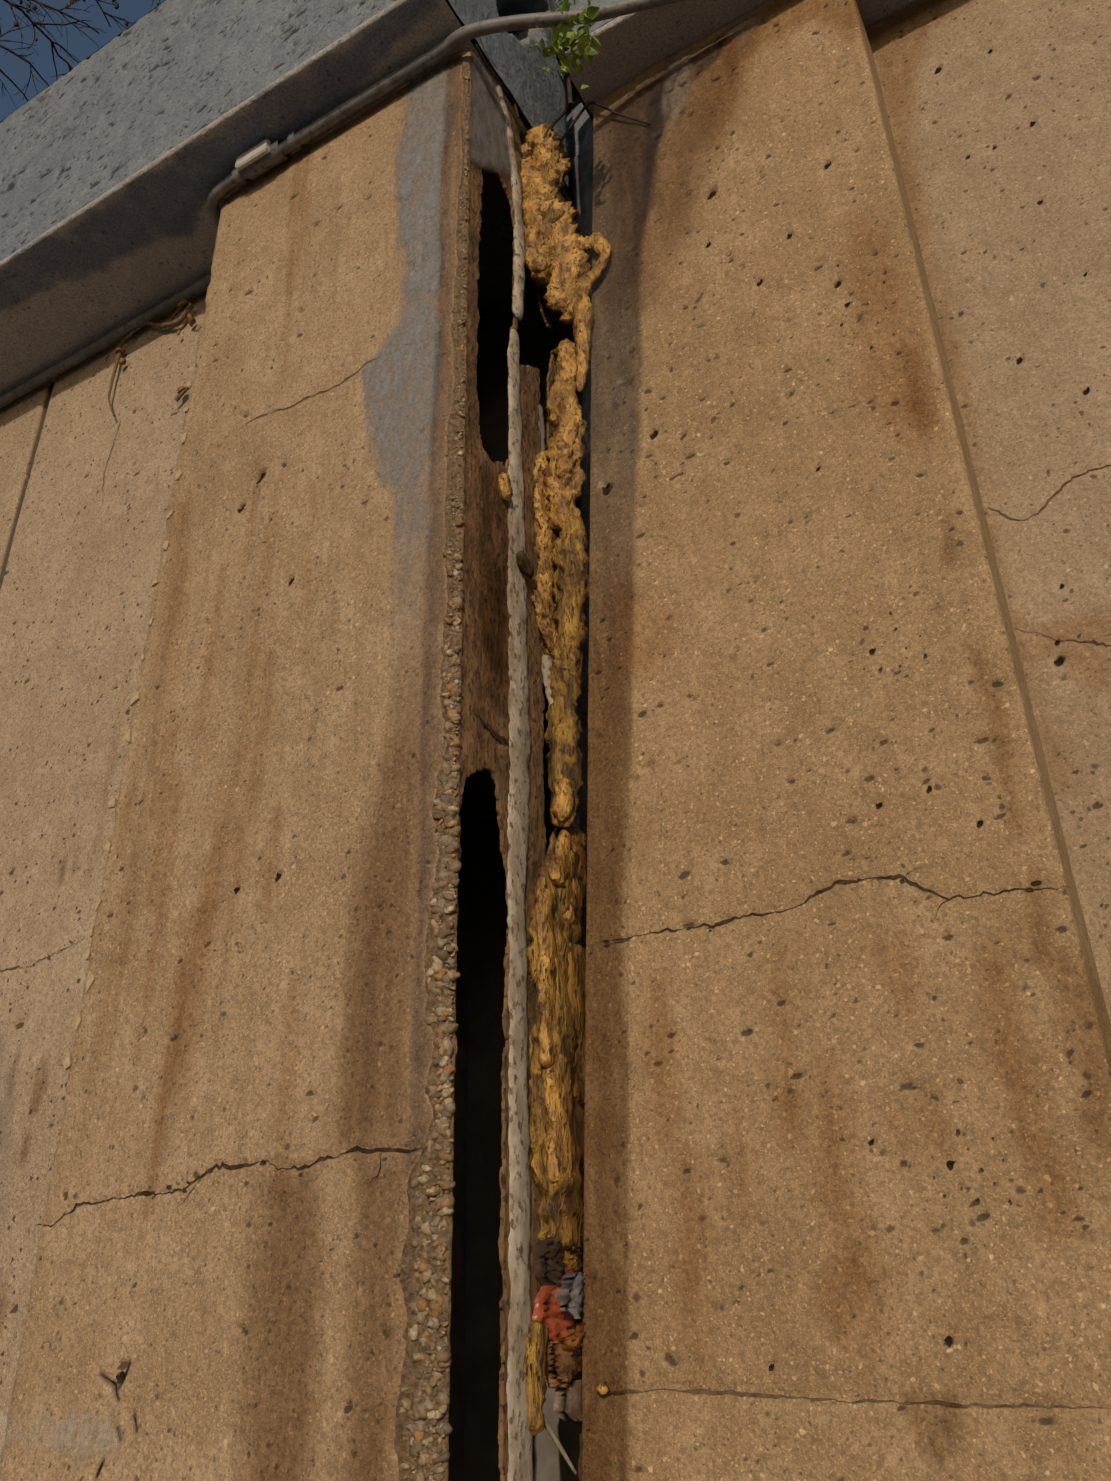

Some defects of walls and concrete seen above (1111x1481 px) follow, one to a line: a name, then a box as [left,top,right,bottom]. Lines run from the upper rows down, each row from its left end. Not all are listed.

crack [246,344,408,424]
crack [988,465,1111,520]
spalling [394,60,472,1481]
crack [592,867,1070,946]
crack [36,1145,424,1227]
crack [591,1389,1111,1409]